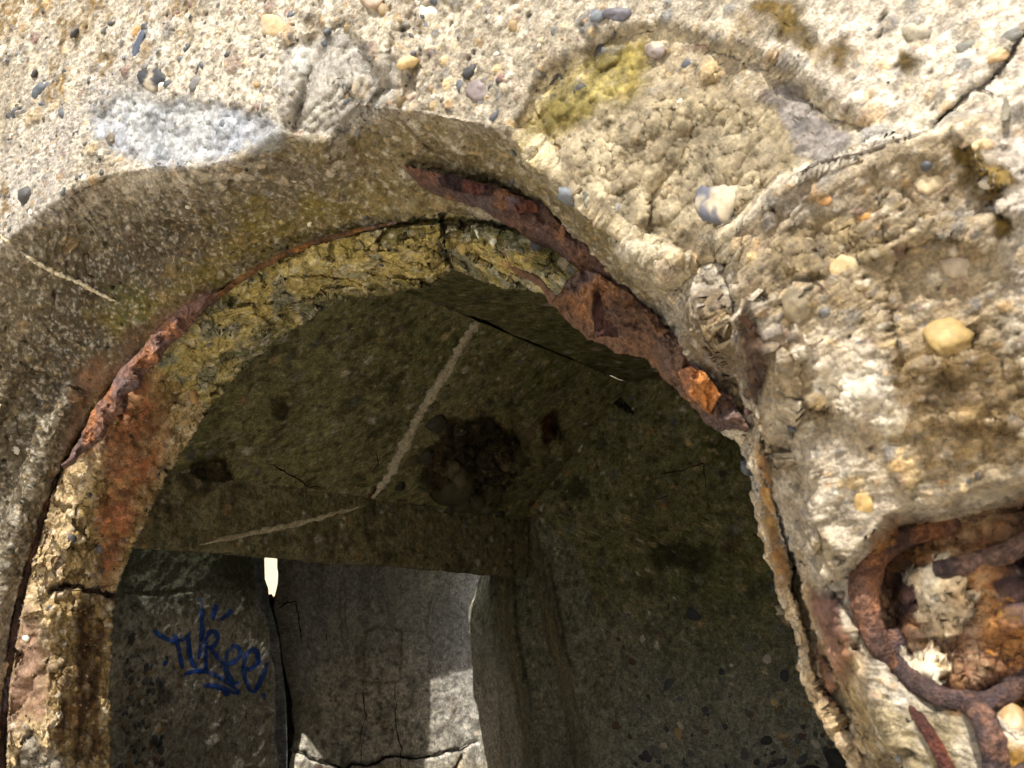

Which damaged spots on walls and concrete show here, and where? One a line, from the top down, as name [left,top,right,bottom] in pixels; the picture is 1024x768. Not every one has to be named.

crack [789,34,1024,178]
crack [773,281,832,307]
rust [61,290,212,464]
rust [97,379,168,574]
rust [8,612,46,716]
crack [293,682,477,768]
peeling [899,553,986,686]